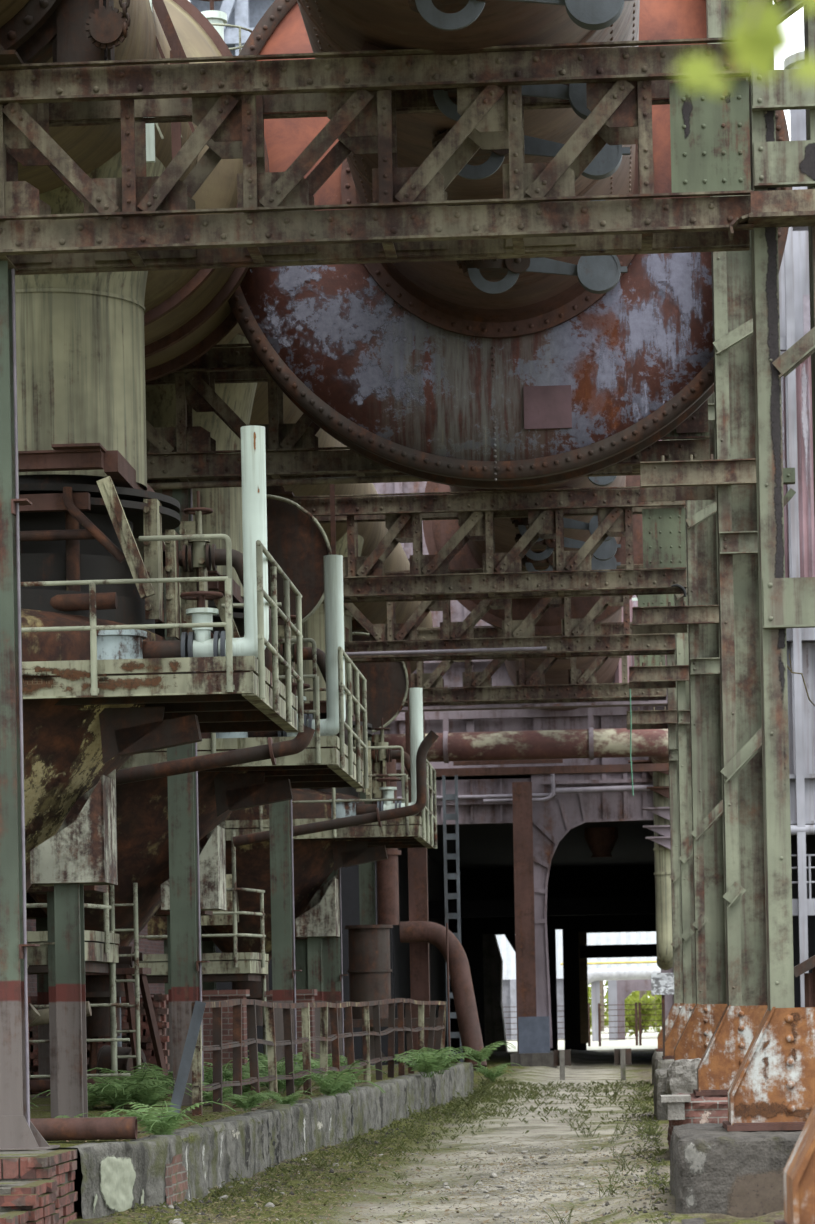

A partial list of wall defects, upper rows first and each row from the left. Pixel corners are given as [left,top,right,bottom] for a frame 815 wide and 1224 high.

peeling [264,259,424,407]
corrosion [573,312,626,429]
peeling [592,247,702,422]
corrosion [22,660,181,695]
corrosion [790,1013,800,1061]
corrosion [734,1101,813,1122]